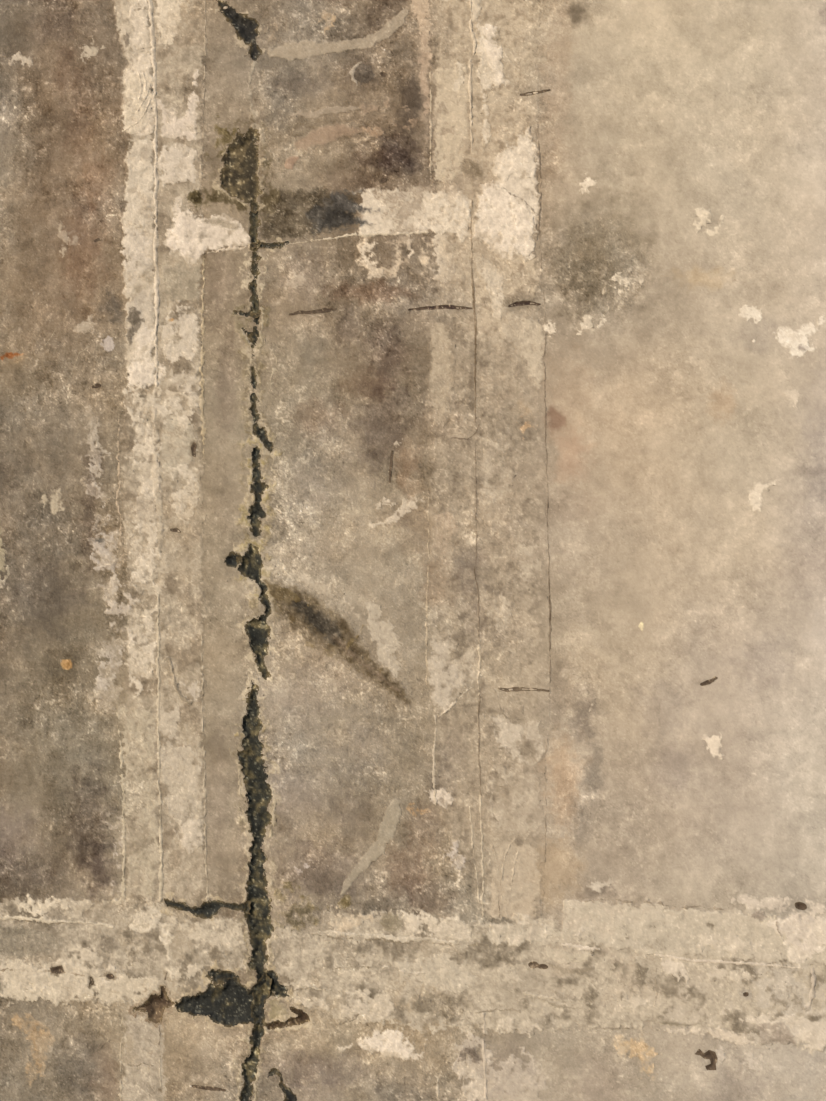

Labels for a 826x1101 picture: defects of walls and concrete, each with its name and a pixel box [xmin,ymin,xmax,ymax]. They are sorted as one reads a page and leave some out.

crack [213,0,267,130]
water stain [261,7,341,46]
water stain [341,97,427,144]
water stain [303,185,388,233]
crack [159,202,364,1101]
water stain [259,576,417,710]